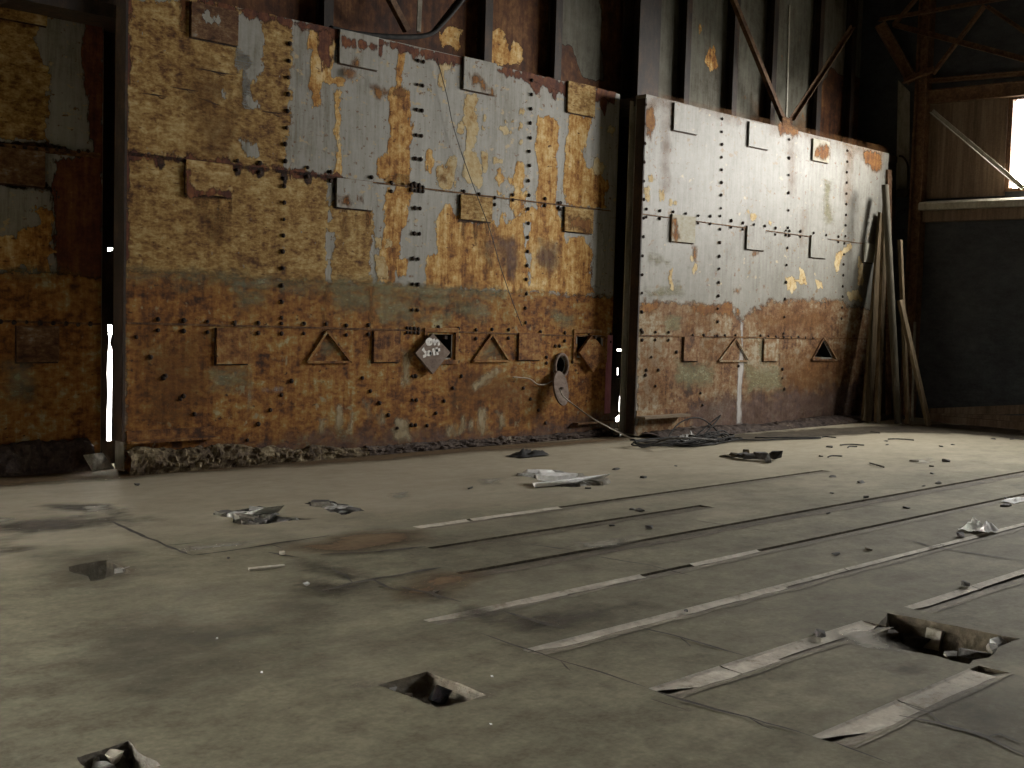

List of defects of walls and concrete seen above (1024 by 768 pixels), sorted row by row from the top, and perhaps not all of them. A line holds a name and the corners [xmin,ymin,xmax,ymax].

peeling [307,30,358,109]
corrosion [0,19,103,279]
peeling [436,93,525,190]
peeling [644,174,677,206]
corrosion [692,288,739,316]
peeling [785,267,823,294]
peeling [834,243,864,302]
spalling [523,523,1024,652]
spalling [649,569,1024,739]
spalling [379,671,486,708]
spalling [77,741,161,768]